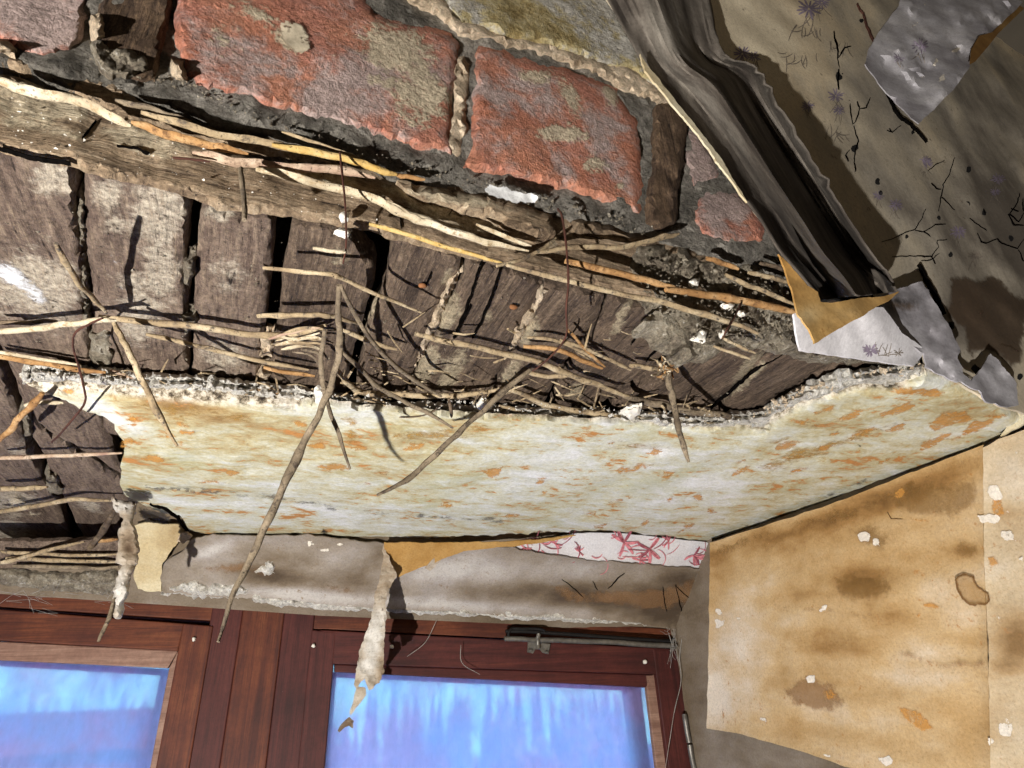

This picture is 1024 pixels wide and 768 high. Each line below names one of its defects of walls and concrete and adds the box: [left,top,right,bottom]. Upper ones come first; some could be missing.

flaking render [334,211,351,239]
peeling [407,0,899,344]
crack [833,3,1024,328]
spalling [21,360,922,428]
peeling [338,545,397,732]
leakage [955,574,990,606]